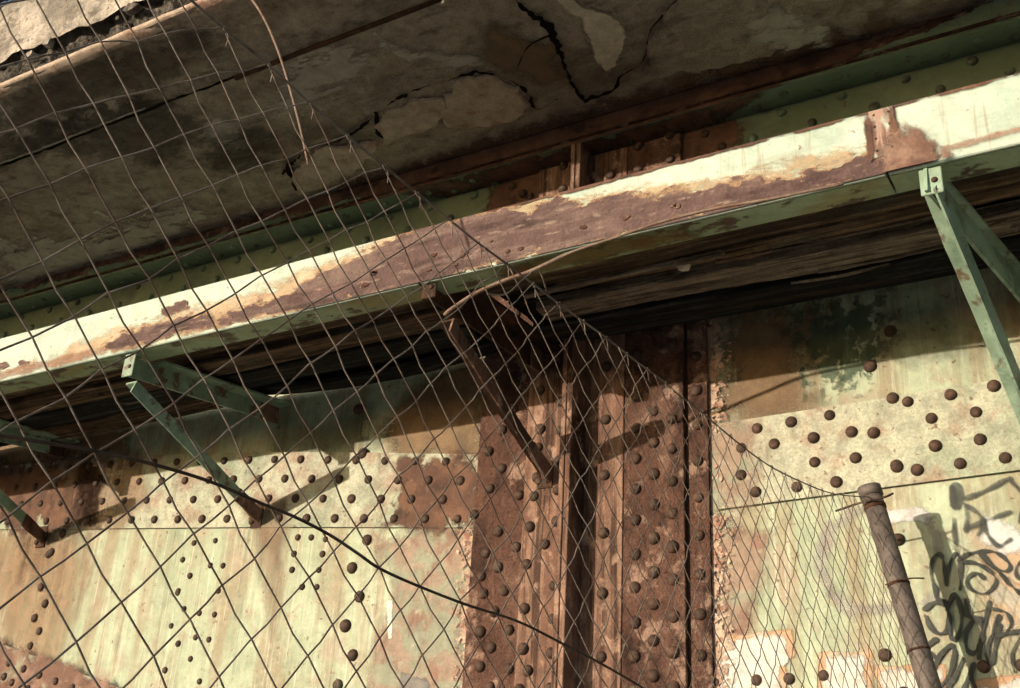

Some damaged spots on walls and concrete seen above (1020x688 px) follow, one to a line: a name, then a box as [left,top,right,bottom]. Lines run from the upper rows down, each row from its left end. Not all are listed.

spalling [0,0,197,83]
water stain [0,204,215,287]
spalling [291,73,529,195]
crack [282,0,677,191]
corrosion [0,7,1020,379]
corrosion [0,452,144,688]